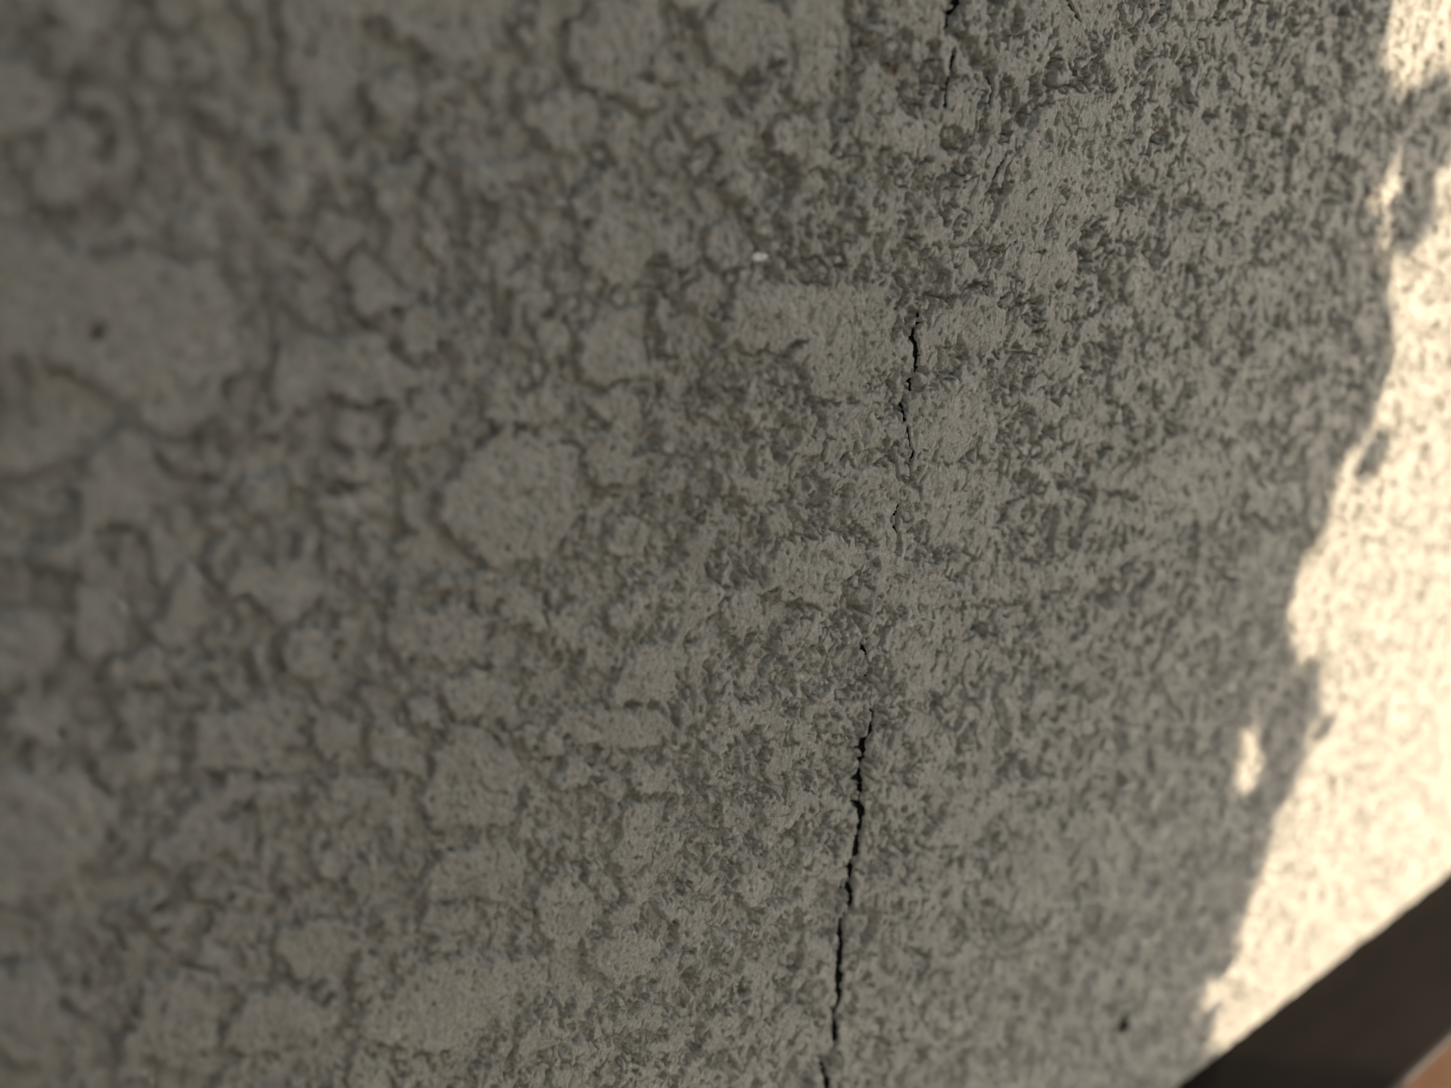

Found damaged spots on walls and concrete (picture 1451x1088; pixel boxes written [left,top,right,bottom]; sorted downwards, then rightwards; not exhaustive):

crack [943,0,960,107]
crack [897,312,920,462]
crack [817,638,877,1088]